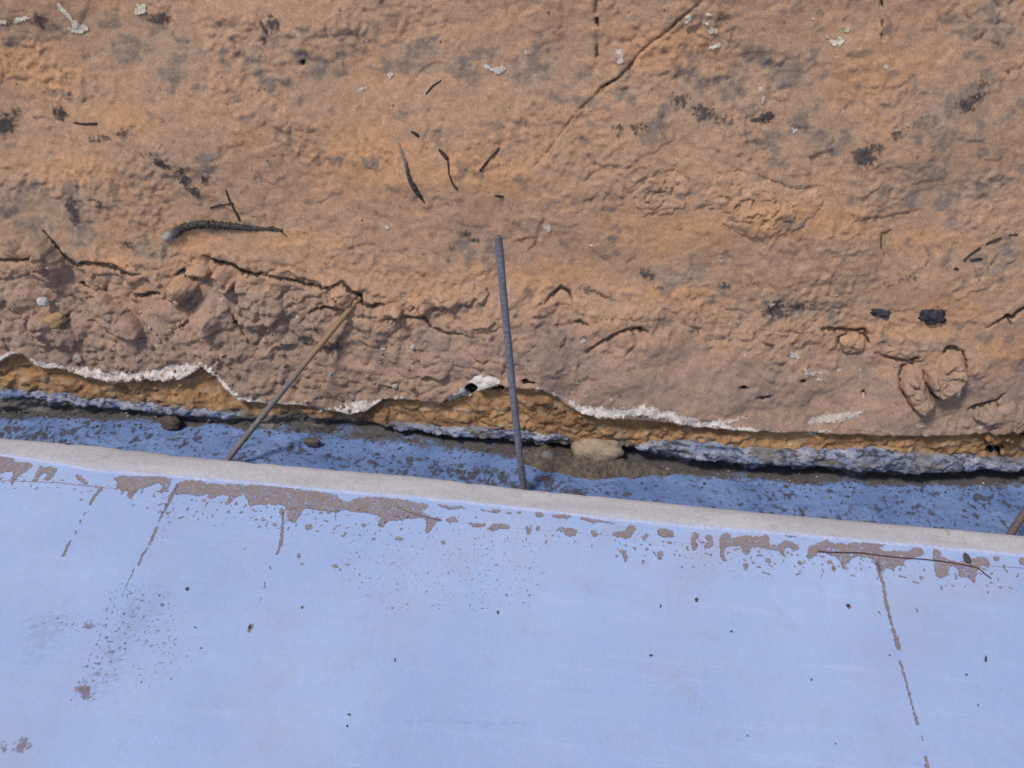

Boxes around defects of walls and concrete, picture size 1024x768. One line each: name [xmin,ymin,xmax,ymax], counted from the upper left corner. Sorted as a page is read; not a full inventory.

crack [590,60,634,101]
crack [44,231,459,335]
crack [543,287,648,353]
spalling [0,413,634,499]
peeling [0,456,1024,593]
crack [872,553,930,768]